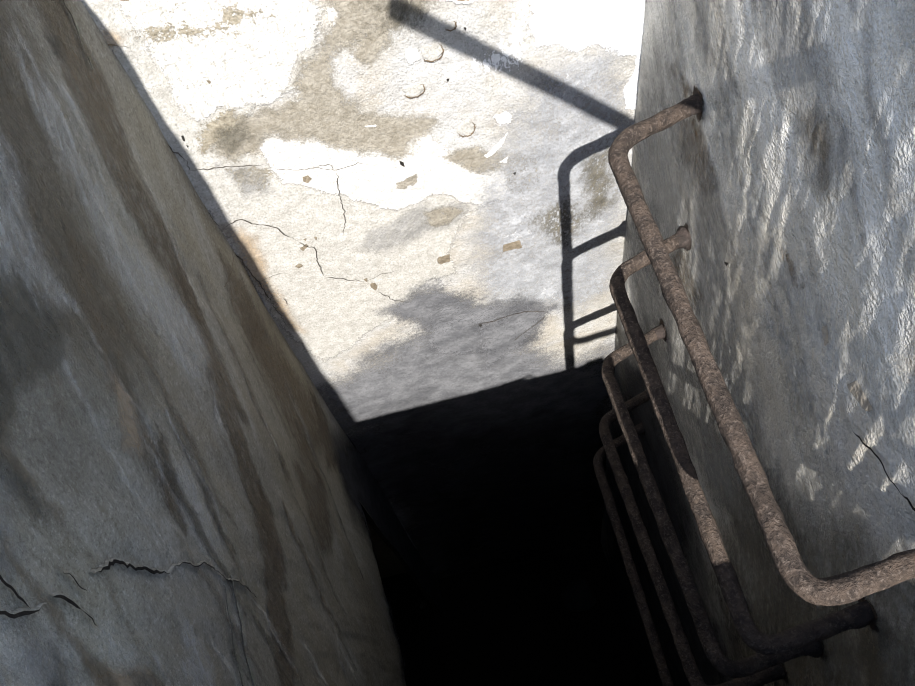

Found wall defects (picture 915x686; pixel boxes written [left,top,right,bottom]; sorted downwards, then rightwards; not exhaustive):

crack [0,558,258,686]
leakage [0,0,296,686]
peeling [81,0,541,363]
leakage [219,58,733,686]
peeling [529,0,645,110]
corrosion [677,116,716,193]
leakage [635,121,874,578]
leakage [614,265,915,686]